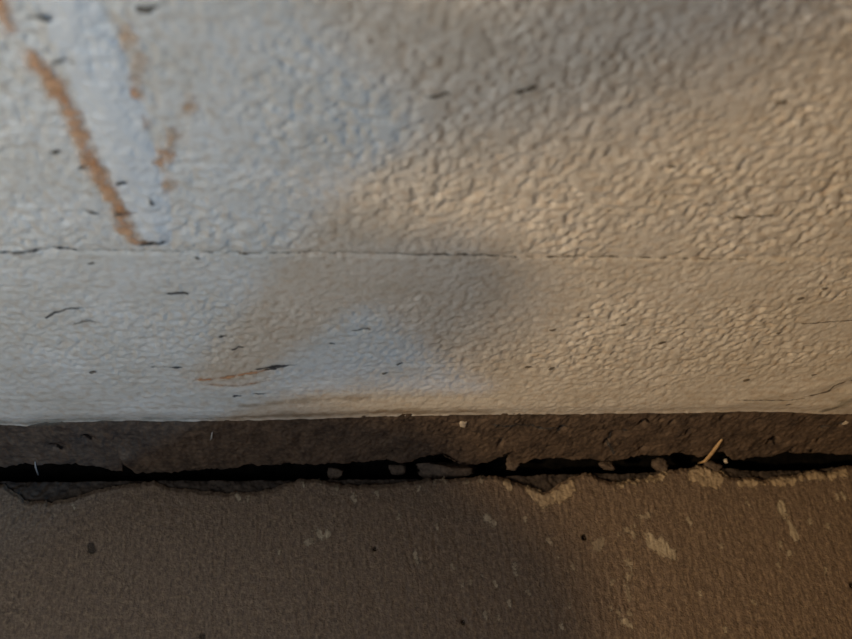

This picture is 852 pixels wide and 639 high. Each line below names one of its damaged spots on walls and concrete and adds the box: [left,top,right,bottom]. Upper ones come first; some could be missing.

crack [0,429,852,482]
spalling [498,474,579,509]
spalling [591,471,668,488]
spalling [688,465,849,490]